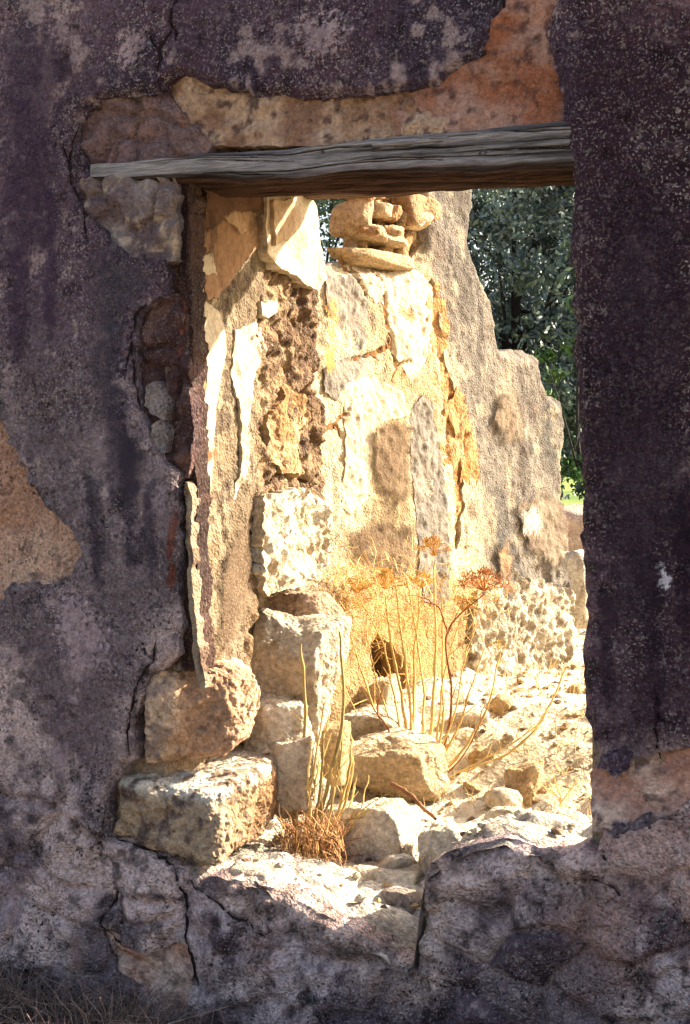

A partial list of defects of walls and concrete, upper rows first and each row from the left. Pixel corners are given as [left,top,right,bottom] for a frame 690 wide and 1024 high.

crack [150,0,177,90]
crack [63,123,88,241]
spalling [76,0,564,266]
peeling [0,420,82,600]
peeling [590,746,690,840]
crack [99,891,131,949]
crack [109,836,265,987]